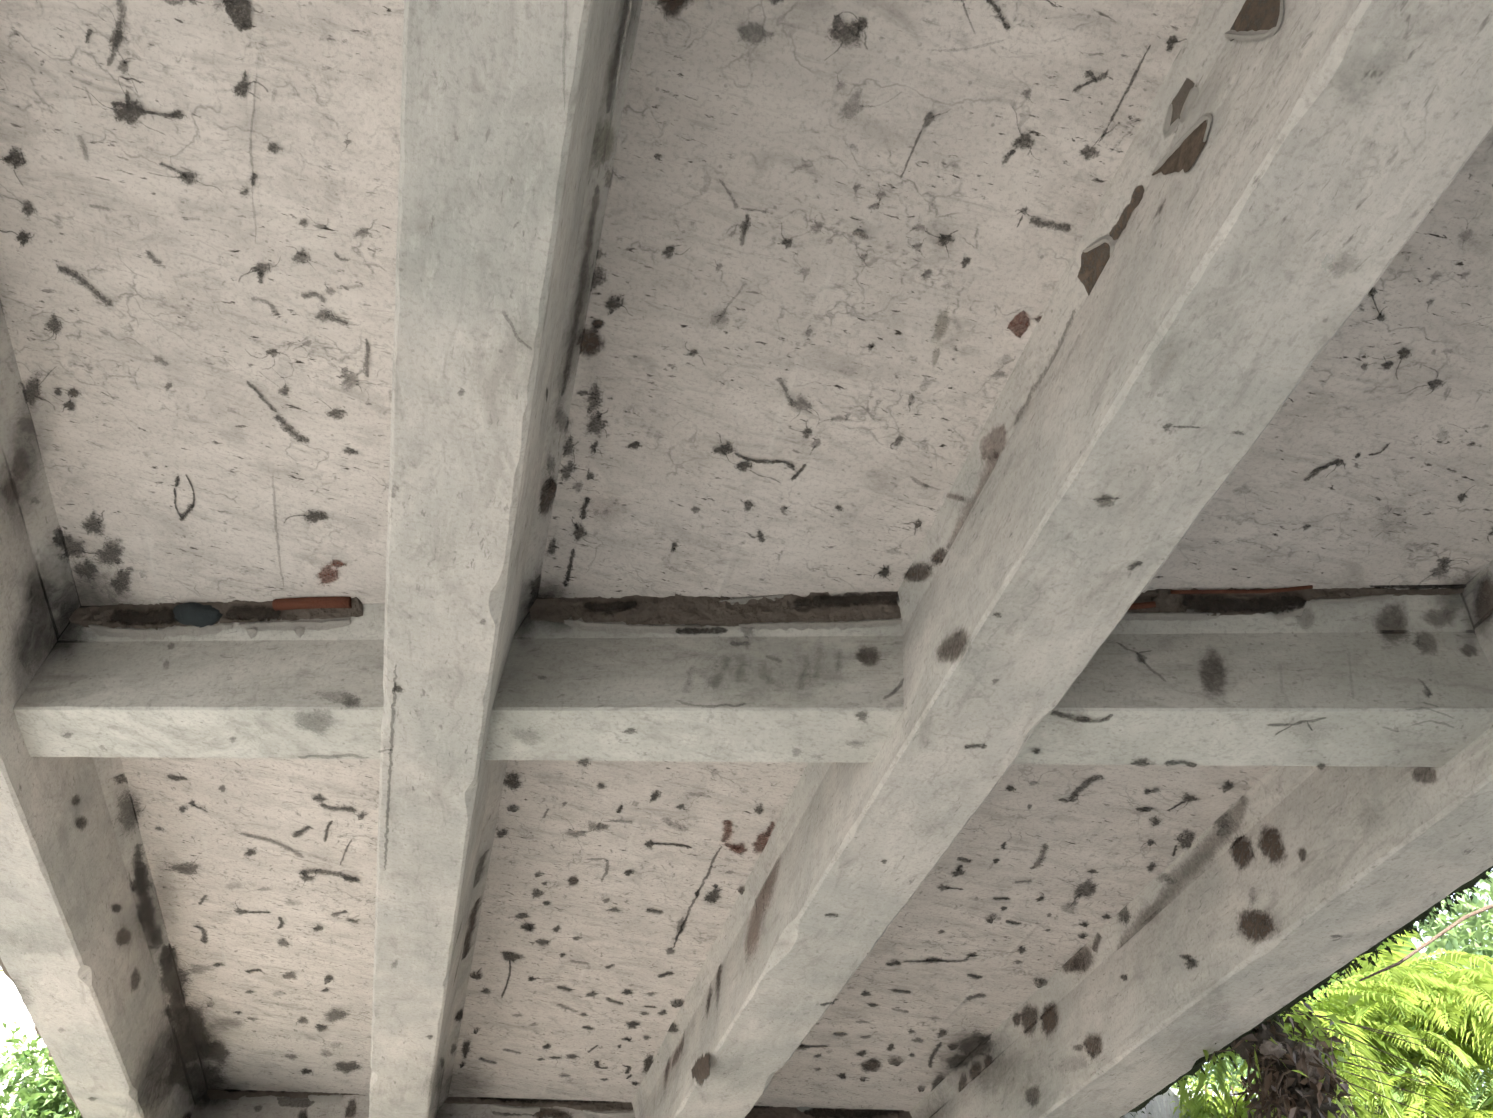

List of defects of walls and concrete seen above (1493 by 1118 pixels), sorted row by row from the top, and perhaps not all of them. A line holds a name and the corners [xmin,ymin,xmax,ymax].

peeling [1224,0,1284,42]
peeling [1077,78,1212,296]
spalling [68,597,363,640]
spalling [529,591,903,636]
spalling [1121,584,1466,621]
spalling [745,1106,912,1118]